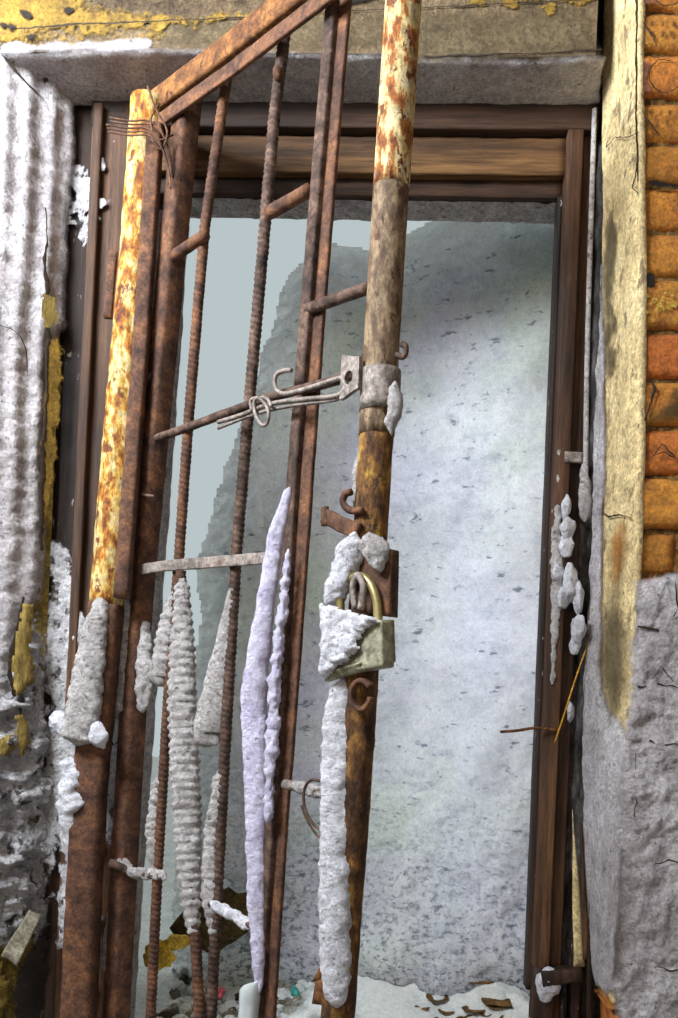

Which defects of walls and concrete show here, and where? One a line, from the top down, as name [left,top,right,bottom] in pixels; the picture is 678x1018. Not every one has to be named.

spalling [38,207,64,551]
peeling [0,597,36,756]
spalling [0,909,50,1018]